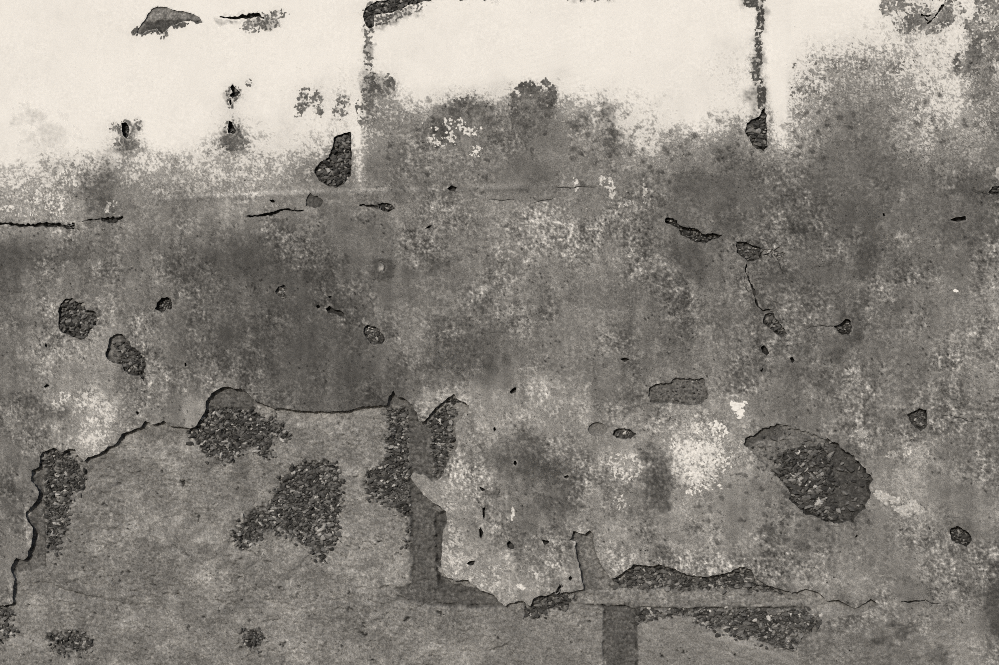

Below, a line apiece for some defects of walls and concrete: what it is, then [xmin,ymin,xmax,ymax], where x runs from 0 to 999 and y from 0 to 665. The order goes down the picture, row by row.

flaking render [131,5,204,40]
flaking render [294,0,434,188]
peeling [416,77,558,156]
peeling [743,0,769,152]
peeling [879,0,999,103]
crack [0,215,123,230]
flaking render [665,216,722,244]
crack [743,260,774,316]
flaking render [57,296,100,341]
flaking render [104,334,147,381]
flaking render [647,376,710,406]
spalling [0,385,901,665]